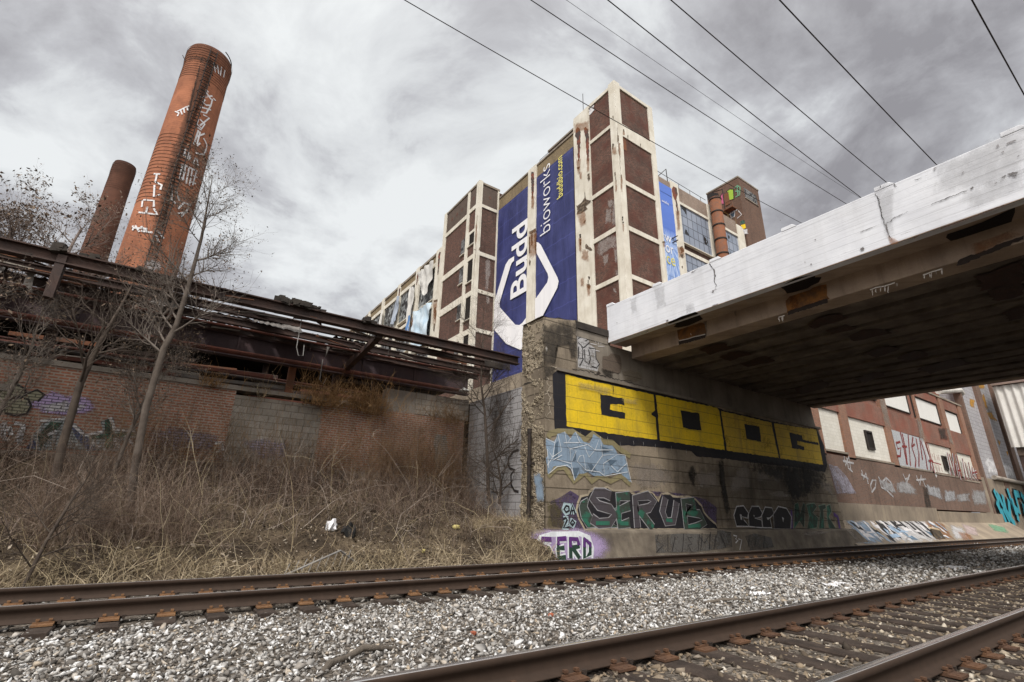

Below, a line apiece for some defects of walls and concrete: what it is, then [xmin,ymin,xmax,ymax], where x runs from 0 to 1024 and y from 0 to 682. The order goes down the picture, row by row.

crack [863,178,920,244]
spalling [940,204,1024,266]
spalling [781,264,821,294]
spalling [666,312,703,328]